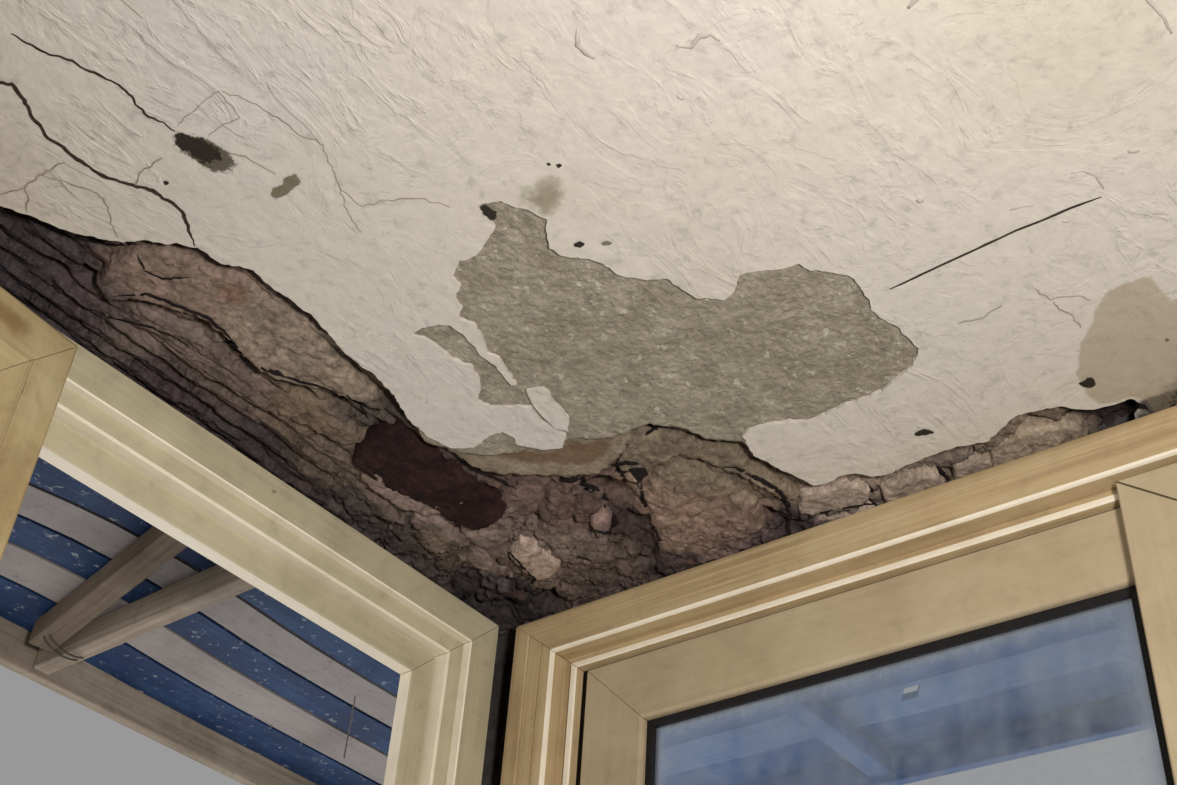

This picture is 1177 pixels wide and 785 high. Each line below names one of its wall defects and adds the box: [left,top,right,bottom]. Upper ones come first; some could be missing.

crack [0,33,450,246]
peeling [271,174,301,199]
spalling [0,201,1142,636]
water stain [1138,392,1177,418]